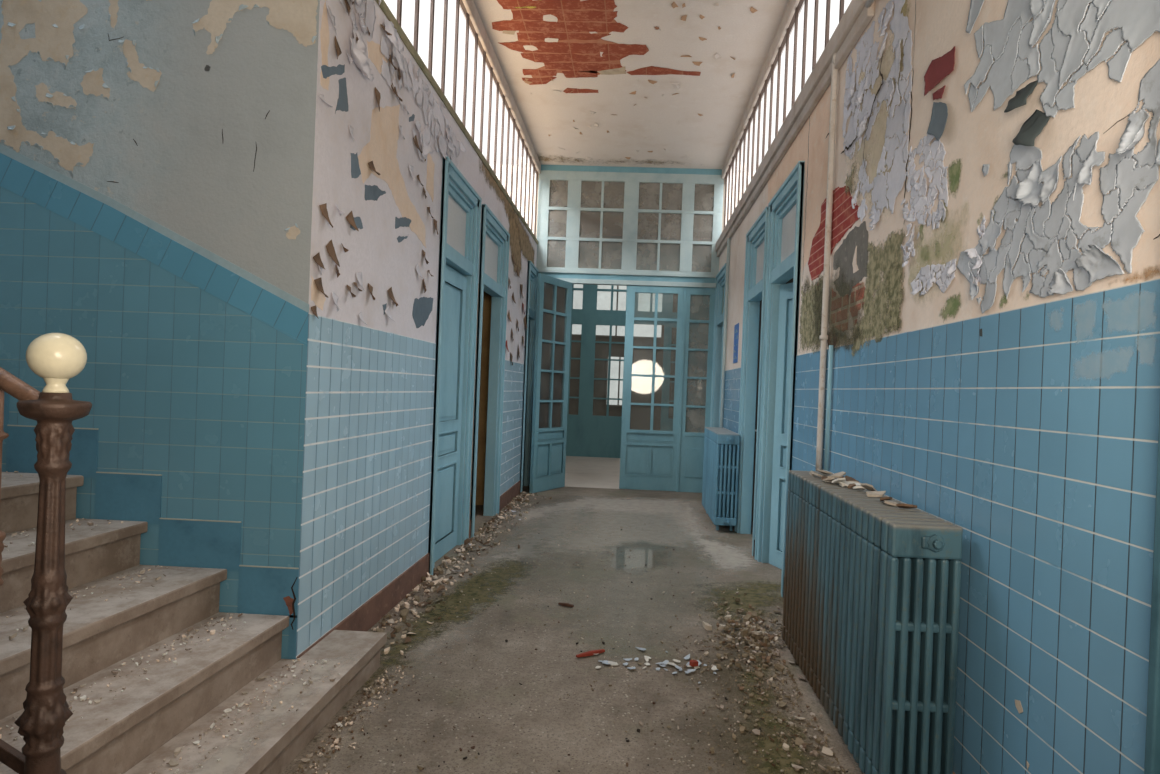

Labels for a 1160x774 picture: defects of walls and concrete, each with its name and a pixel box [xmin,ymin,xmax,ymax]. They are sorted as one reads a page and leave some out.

peeling [0,0,94,178]
peeling [32,68,110,108]
peeling [122,39,162,92]
peeling [191,0,467,328]
flaking render [492,0,735,106]
peeling [768,0,1160,326]